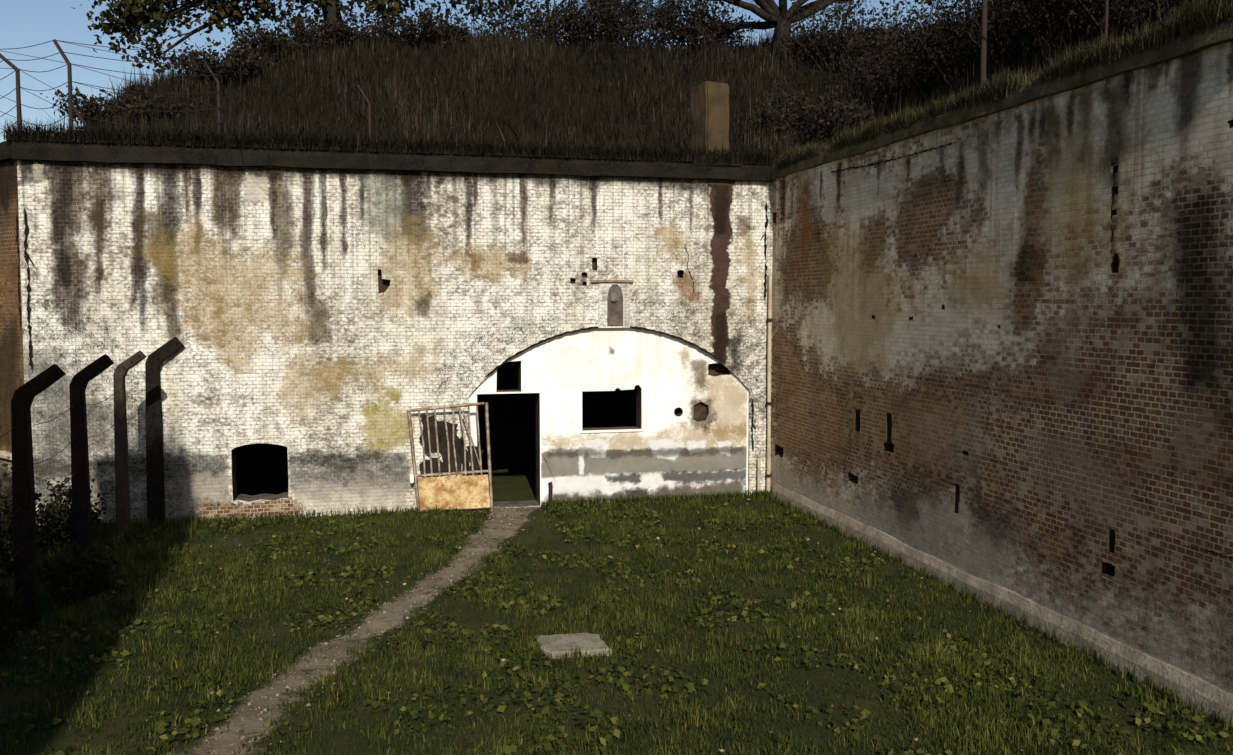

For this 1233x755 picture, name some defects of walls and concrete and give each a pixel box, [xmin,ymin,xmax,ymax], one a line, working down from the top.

damp [269,170,365,302]
damp [401,175,429,248]
damp [464,173,477,252]
damp [519,175,527,240]
damp [940,142,963,207]
damp [1015,72,1133,198]
damp [1148,51,1201,141]
damp [418,297,429,315]
damp [694,179,735,385]
spalling [674,402,709,422]
peeling [771,139,1233,692]
peeling [550,438,732,497]